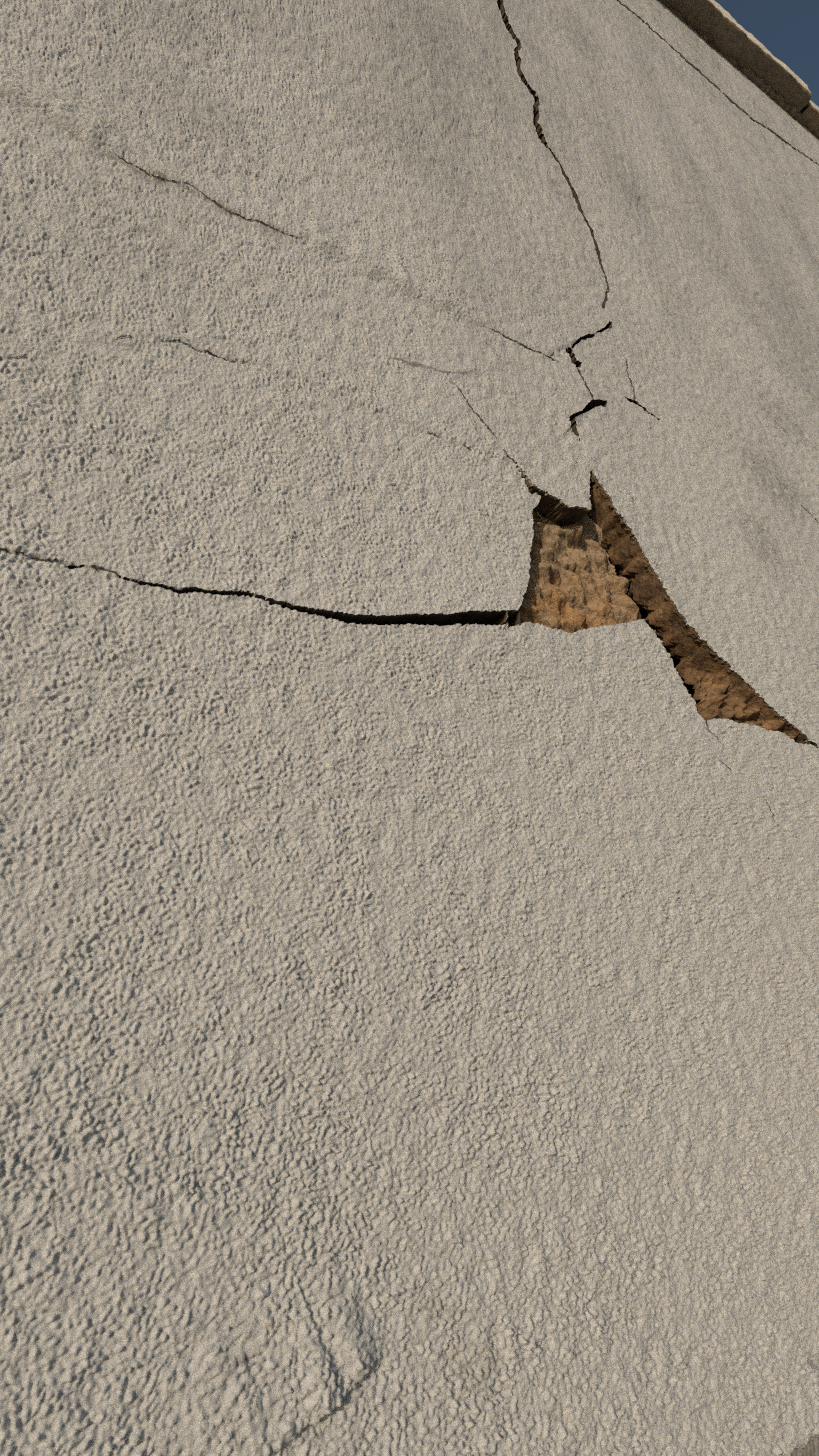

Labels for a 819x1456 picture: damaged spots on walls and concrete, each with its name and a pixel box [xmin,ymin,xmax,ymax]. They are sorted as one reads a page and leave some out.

crack [618,0,819,165]
crack [113,152,298,239]
crack [483,0,659,441]
crack [115,335,248,363]
crack [429,387,517,464]
crack [0,548,521,628]
flaking render [469,466,811,744]
crack [796,739,819,748]